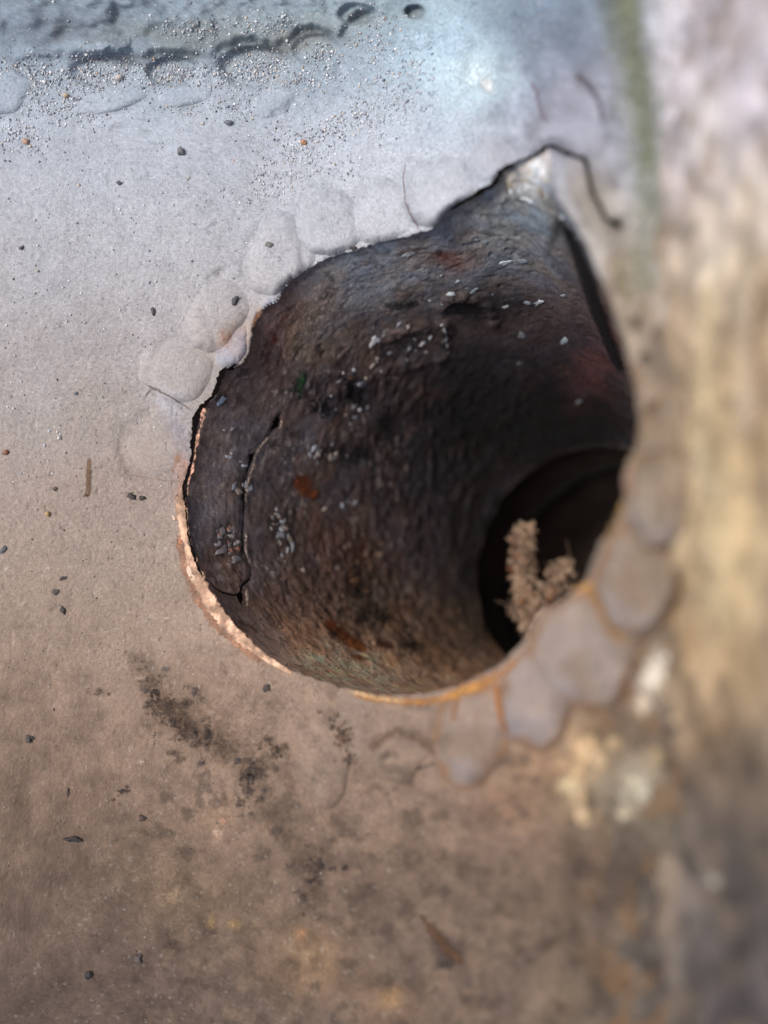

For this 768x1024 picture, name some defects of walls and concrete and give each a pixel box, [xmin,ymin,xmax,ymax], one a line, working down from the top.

peeling [505,163,549,205]
crack [449,74,622,228]
spalling [306,280,544,468]
peeling [225,452,253,499]
spalling [172,496,294,674]
rust [324,619,393,659]
rust [353,660,517,734]